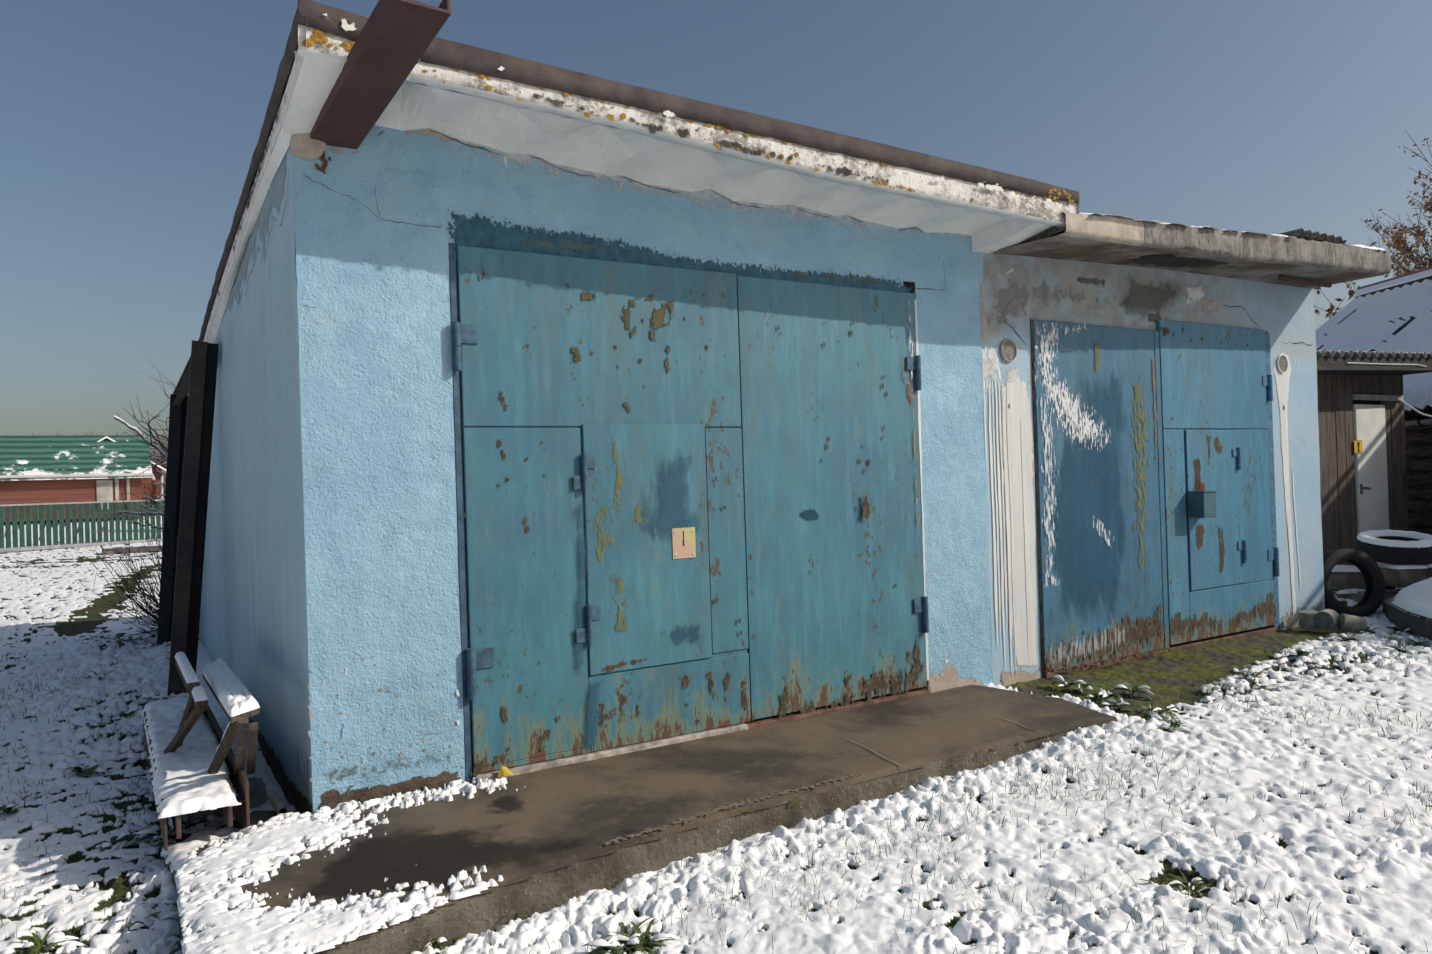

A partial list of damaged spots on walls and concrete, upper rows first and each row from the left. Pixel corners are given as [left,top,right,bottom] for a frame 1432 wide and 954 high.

rust [315,152,331,174]
crack [302,173,442,228]
damp [221,149,291,324]
peeling [794,272,885,284]
damp [998,277,1105,324]
damp [1121,254,1230,322]
peeling [614,289,686,373]
peeling [571,347,594,380]
rust [1046,592,1277,671]
rust [602,658,647,673]
rust [707,671,748,711]
rust [779,633,926,718]